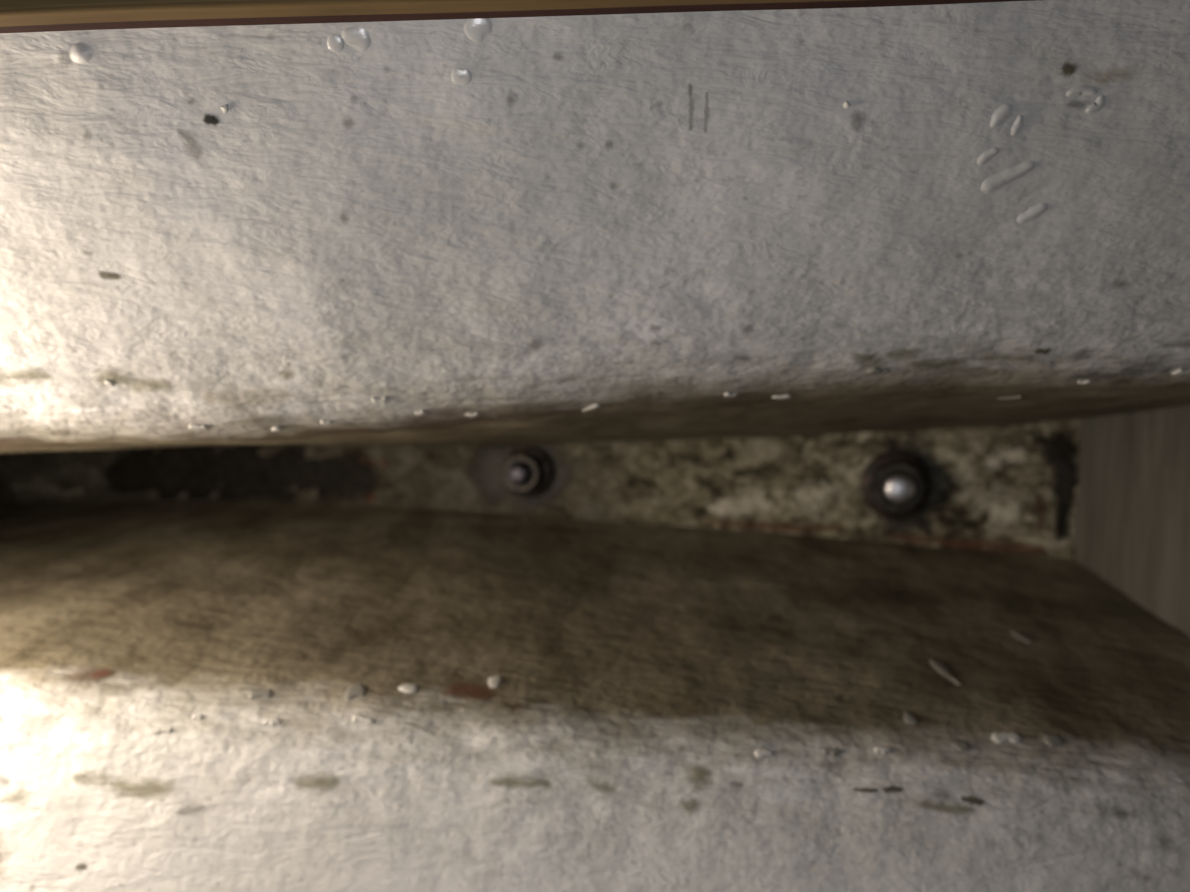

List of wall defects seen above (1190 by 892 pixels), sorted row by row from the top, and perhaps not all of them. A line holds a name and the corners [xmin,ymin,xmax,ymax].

water stain [987,448,1027,471]
water stain [972,485,1025,532]